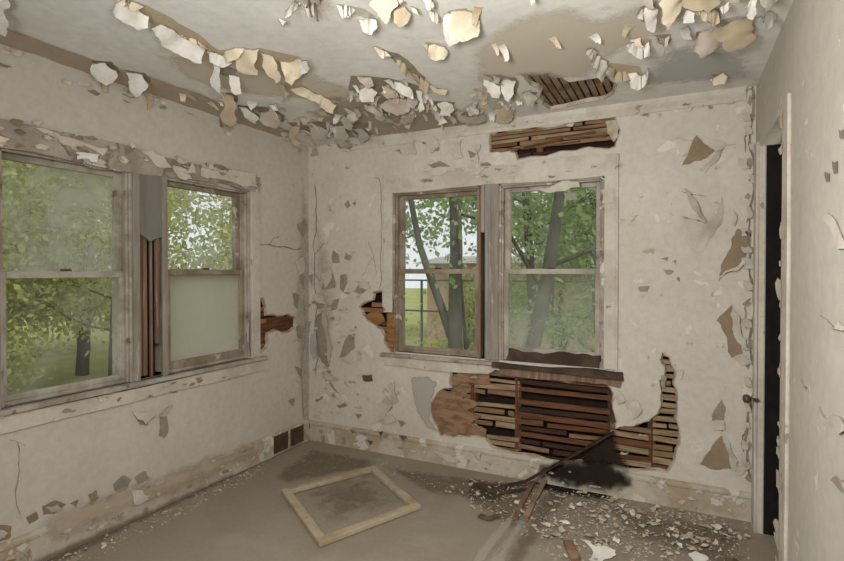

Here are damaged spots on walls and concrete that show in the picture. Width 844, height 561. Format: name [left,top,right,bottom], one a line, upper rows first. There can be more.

peeling [62,61,167,110]
peeling [112,0,778,189]
peeling [0,118,129,170]
peeling [534,170,580,200]
peeling [824,161,838,182]
peeling [681,188,753,280]
peeling [248,251,461,463]
peeling [717,306,753,387]
spalling [430,352,683,484]
peeling [700,400,752,483]
damp [38,442,263,561]
peeling [665,524,733,552]